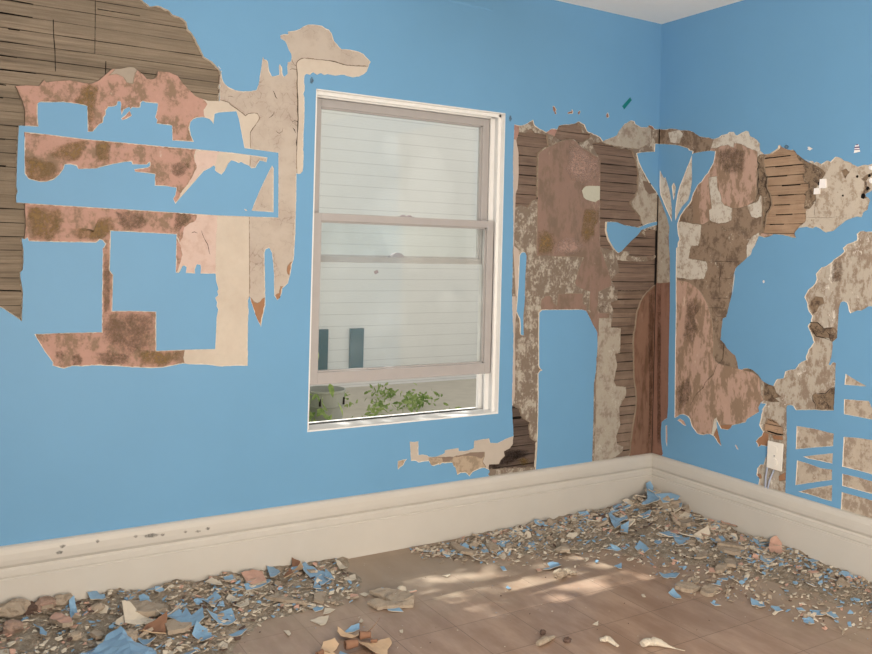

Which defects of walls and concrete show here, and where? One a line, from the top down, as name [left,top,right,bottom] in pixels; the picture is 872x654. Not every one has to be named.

peeling [15,25,370,369]
peeling [398,110,872,518]